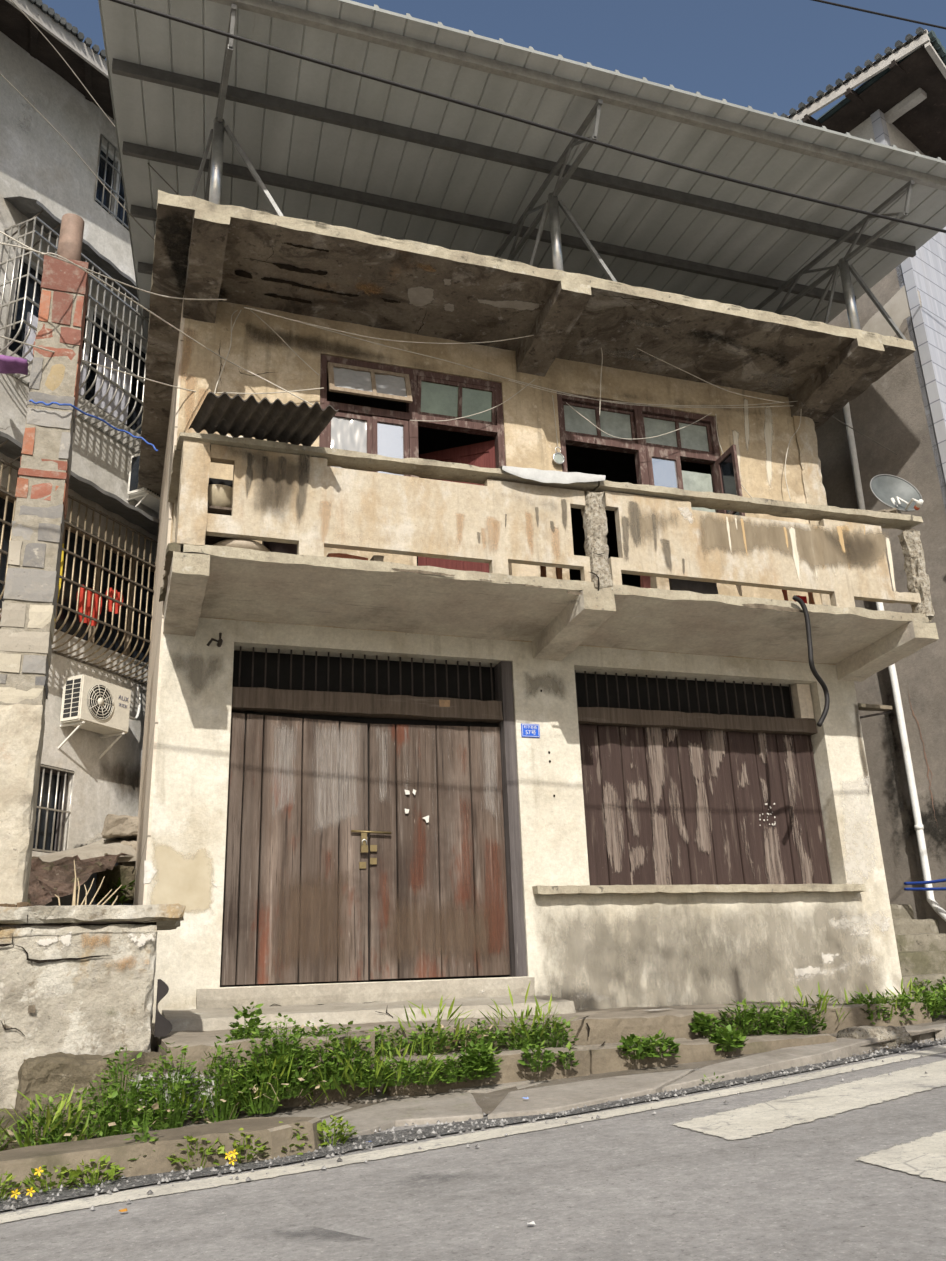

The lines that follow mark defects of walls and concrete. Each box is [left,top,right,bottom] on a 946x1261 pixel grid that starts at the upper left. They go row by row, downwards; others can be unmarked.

leakage [622,501,896,592]
peeling [586,727,726,885]
peeling [738,732,813,884]
leakage [842,705,875,884]
leakage [884,695,946,858]
peeling [37,932,72,949]
crack [0,915,156,963]
peeling [129,931,154,947]